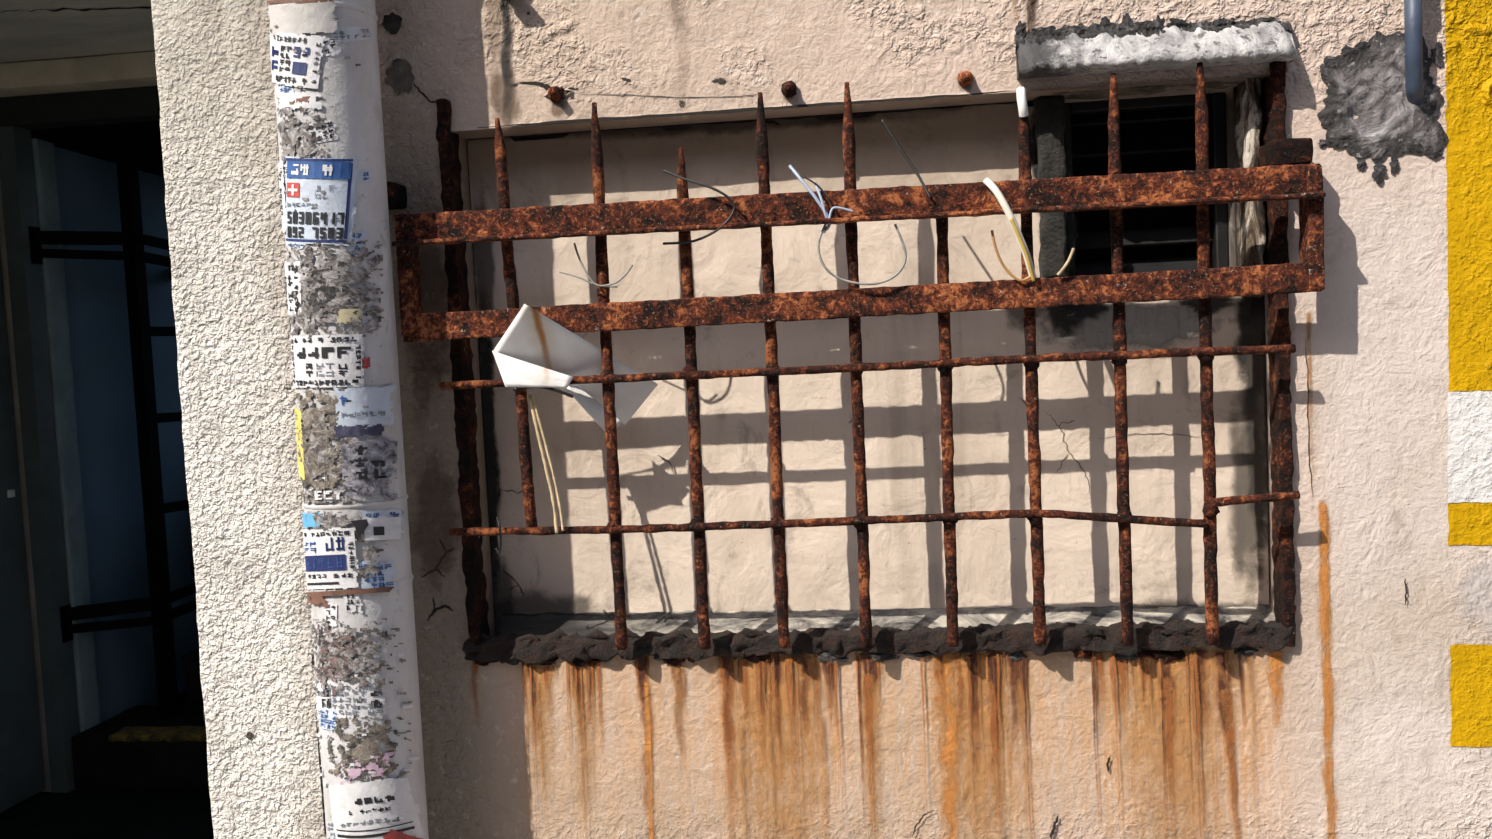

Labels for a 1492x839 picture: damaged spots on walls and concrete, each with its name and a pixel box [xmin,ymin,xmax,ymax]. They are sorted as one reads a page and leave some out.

damp [488,0,512,114]
rust [522,661,601,786]
rust [635,656,653,839]
rust [671,662,686,716]
rust [719,653,840,839]
rust [855,653,883,793]
rust [920,651,1031,839]
rust [1091,648,1283,817]
rust [1319,502,1337,839]